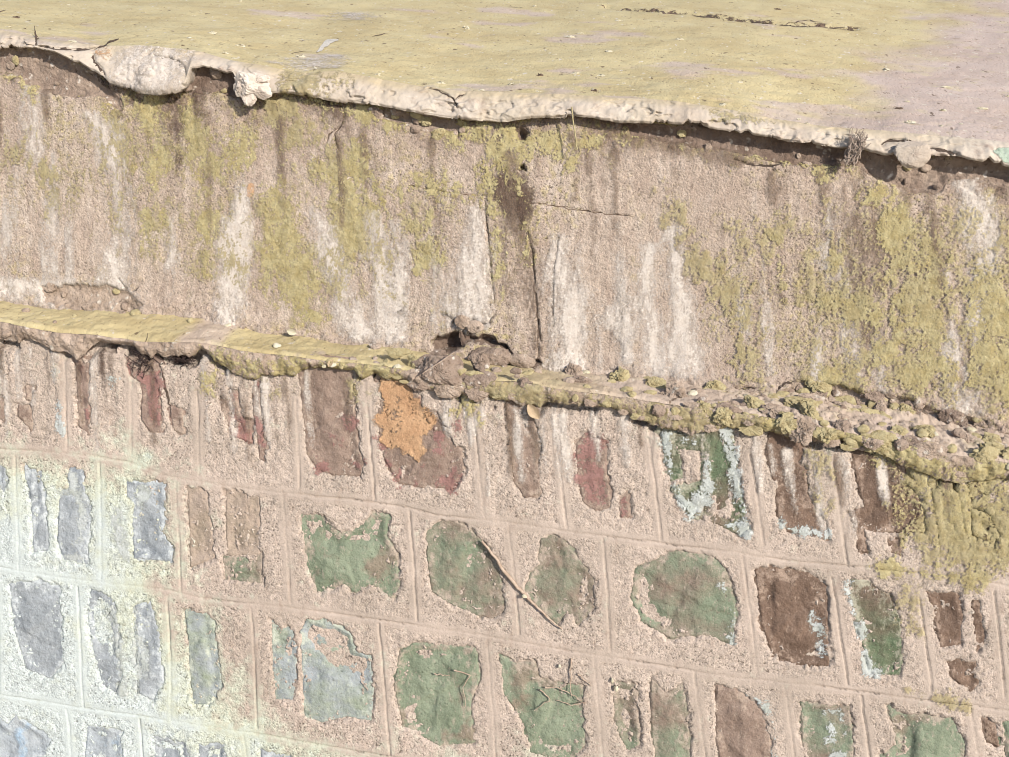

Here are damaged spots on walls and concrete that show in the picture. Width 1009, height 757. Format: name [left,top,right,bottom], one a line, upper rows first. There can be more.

crack [602,5,858,31]
spalling [0,47,123,111]
spalling [183,67,241,98]
spalling [366,105,465,140]
spalling [620,123,1009,195]
water stain [310,138,411,344]
crack [532,203,634,217]
crack [528,233,556,357]
water stain [543,235,589,372]
water stain [599,225,705,379]
spalling [430,328,510,354]
water stain [876,455,890,506]